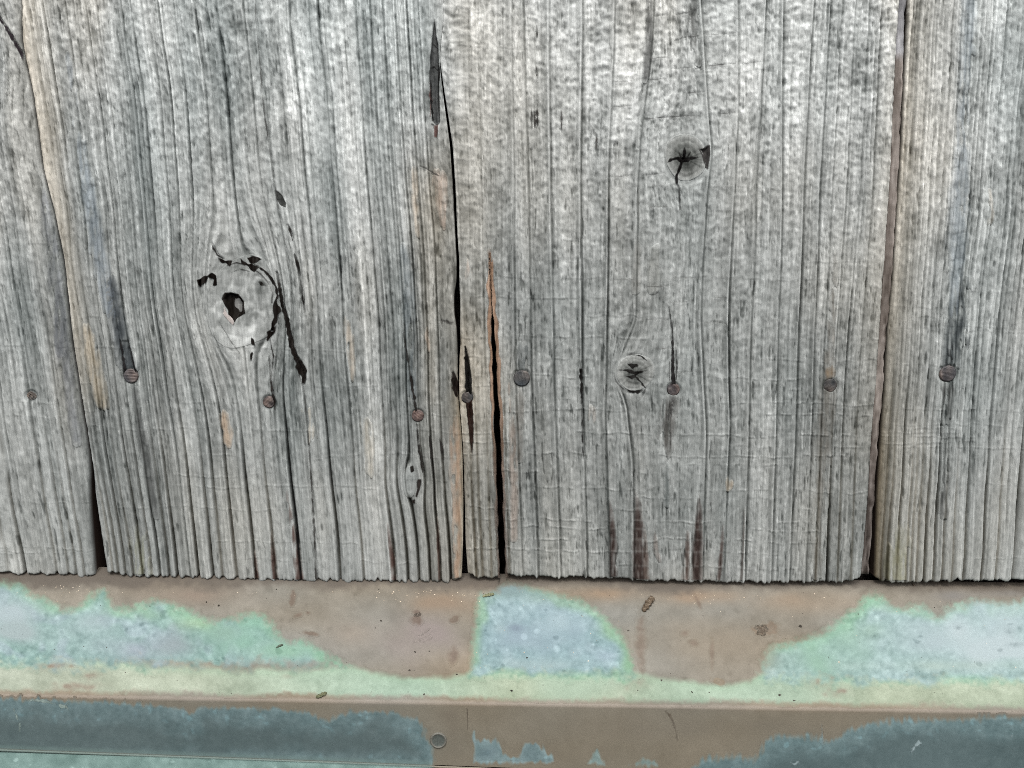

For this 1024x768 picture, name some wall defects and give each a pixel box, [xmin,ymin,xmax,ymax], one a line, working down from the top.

crack [668,147,698,203]
crack [212,226,307,410]
crack [451,254,507,580]
crack [309,455,317,579]